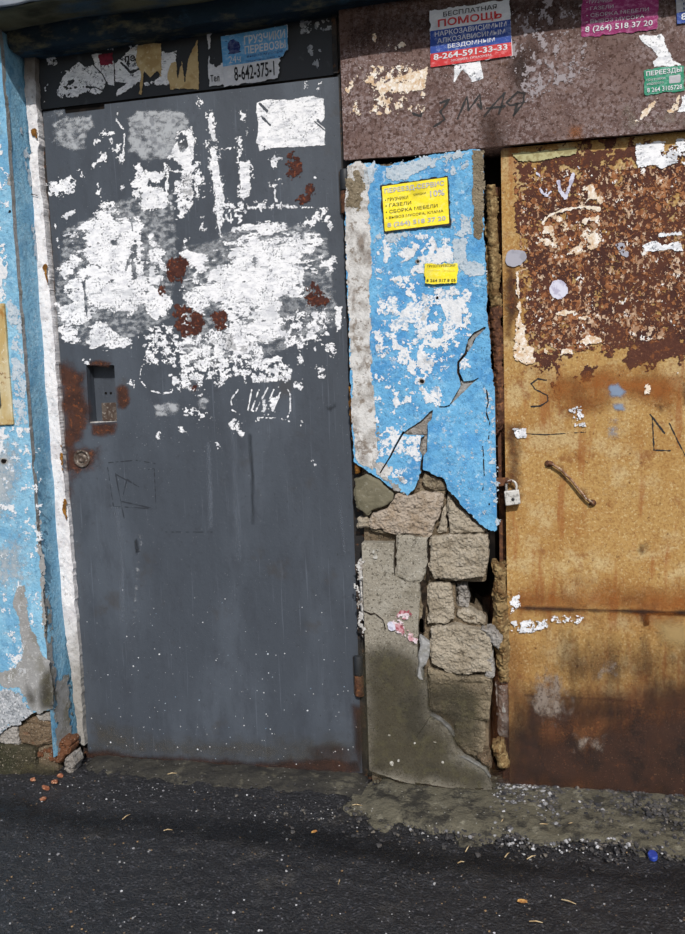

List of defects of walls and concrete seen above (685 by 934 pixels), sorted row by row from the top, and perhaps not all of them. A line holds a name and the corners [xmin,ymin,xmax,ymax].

corrosion [158,256,189,297]
corrosion [172,304,228,338]
corrosion [304,281,331,308]
crack [457,327,486,382]
corrosion [506,159,685,353]
spalling [0,243,84,773]
corrosion [59,365,115,472]
crack [380,431,404,473]
peeling [344,147,586,778]
crack [482,390,490,490]
corrosion [519,592,685,618]
corrosion [505,684,685,797]